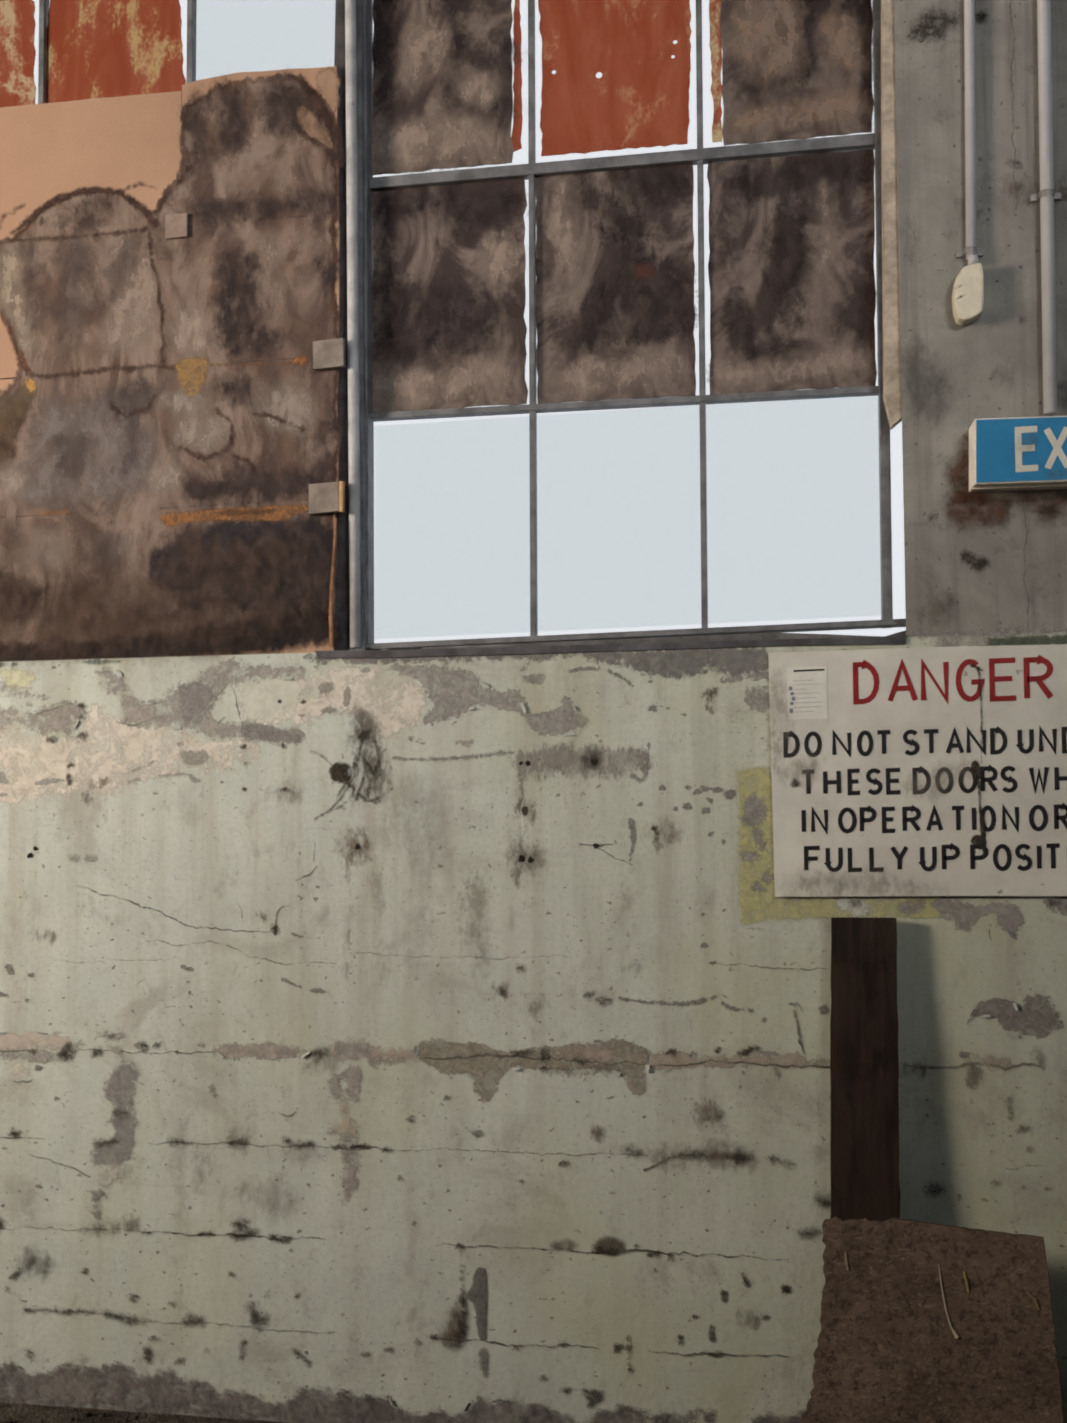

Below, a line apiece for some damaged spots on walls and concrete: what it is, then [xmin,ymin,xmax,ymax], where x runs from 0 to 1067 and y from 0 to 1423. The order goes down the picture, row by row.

flaking render [0,647,770,804]
crack [91,858,325,994]
peeling [897,897,1025,939]
peeling [1044,896,1067,915]
peeling [967,994,1064,1039]
spalling [0,1031,73,1063]
damp [563,1388,602,1407]